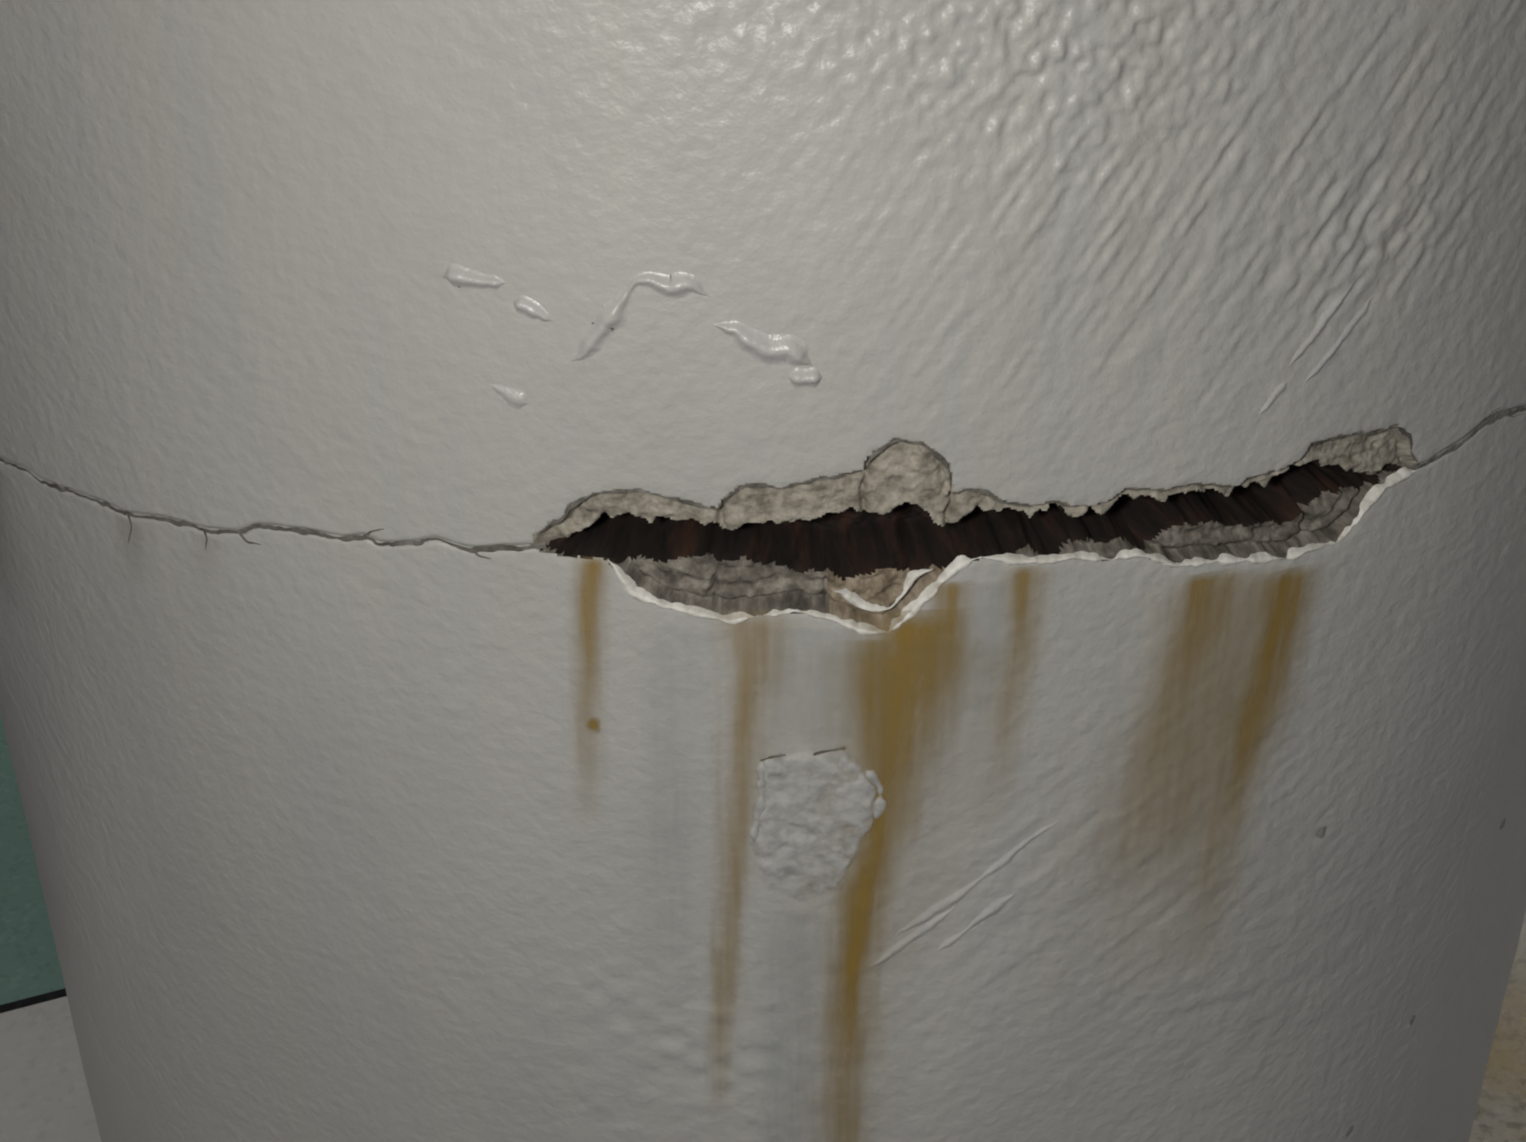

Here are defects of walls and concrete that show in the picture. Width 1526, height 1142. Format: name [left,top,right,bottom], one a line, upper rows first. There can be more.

crack [1412,407,1526,469]
crack [0,458,547,559]
spalling [530,424,1420,636]
corrosion [581,561,600,665]
corrosion [1181,578,1214,669]
corrosion [1235,573,1302,782]
corrosion [837,585,957,1052]